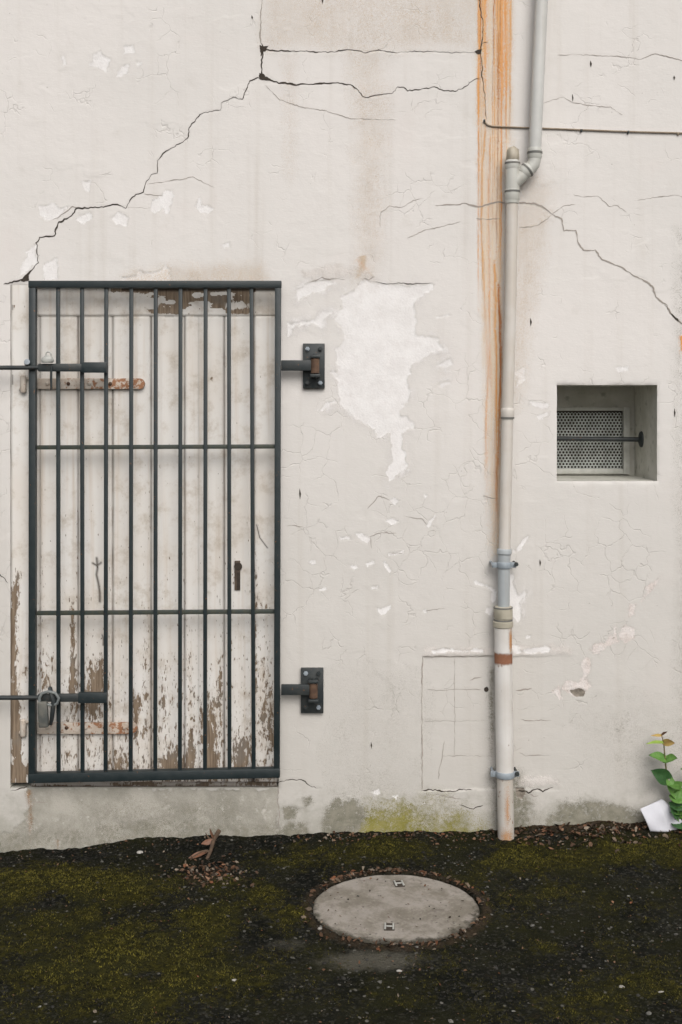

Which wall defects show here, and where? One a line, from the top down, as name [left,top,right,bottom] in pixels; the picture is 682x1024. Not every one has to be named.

crack [4,0,487,284]
peeling [16,245,59,280]
peeling [121,264,171,281]
rust [471,0,518,559]
crack [380,195,682,324]
peeling [281,271,458,525]
rust [494,630,512,665]
peeling [552,575,662,700]
leakage [0,659,455,853]
crack [421,655,491,809]
crack [518,787,553,797]